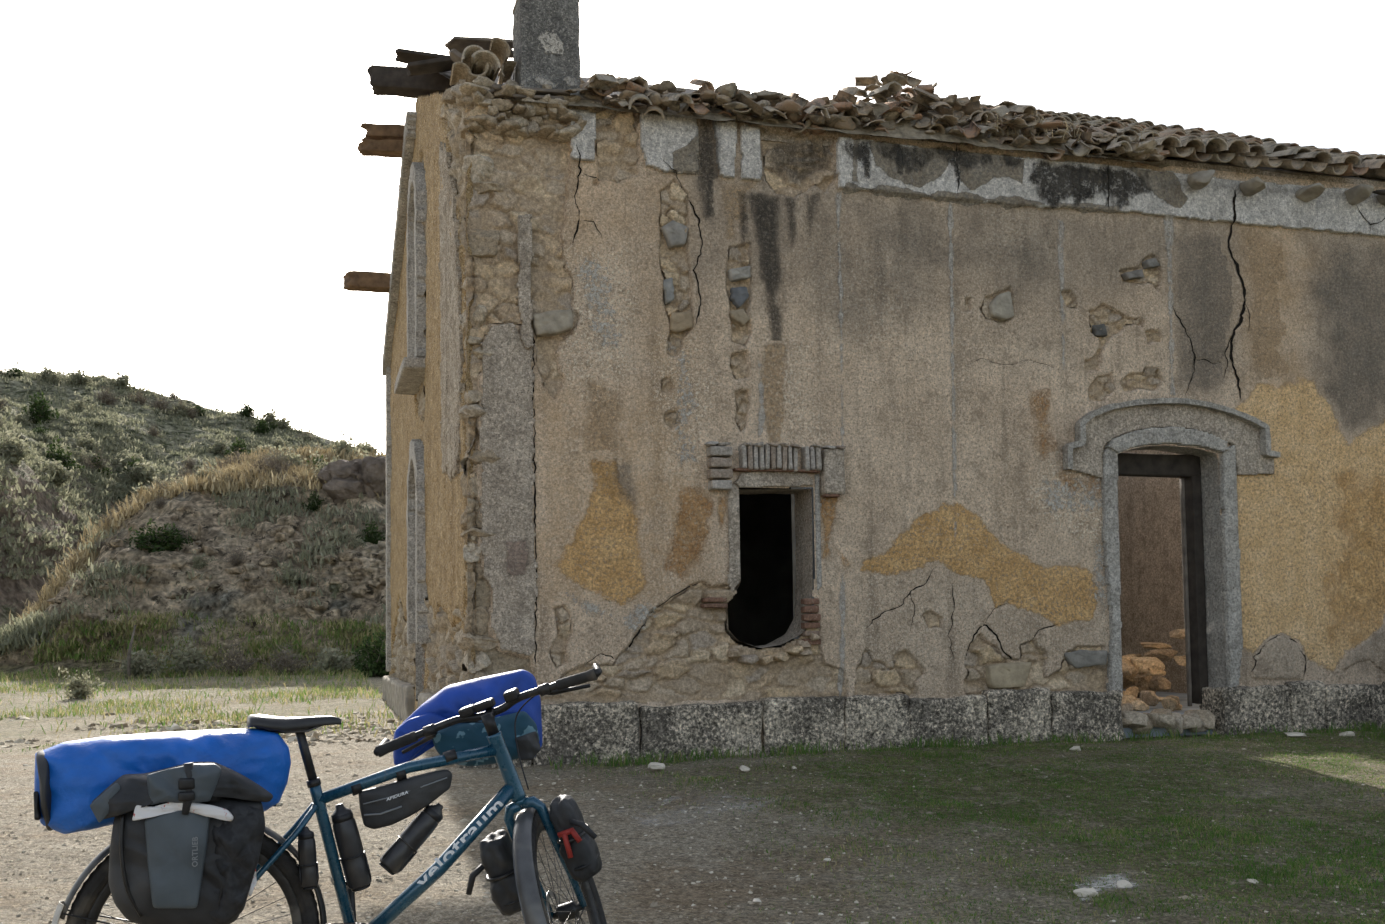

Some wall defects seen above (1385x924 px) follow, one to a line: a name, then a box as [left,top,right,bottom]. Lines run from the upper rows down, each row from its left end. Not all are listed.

flaking render [538,32,563,54]
flaking render [390,37,578,697]
crack [573,144,602,241]
crack [663,160,703,325]
leakage [698,120,813,440]
leakage [845,142,1151,320]
crack [1172,191,1250,399]
peeling [558,460,646,605]
flaking render [540,583,847,705]
crack [866,568,1061,659]
peeling [861,503,1099,628]
peeling [1236,378,1385,671]